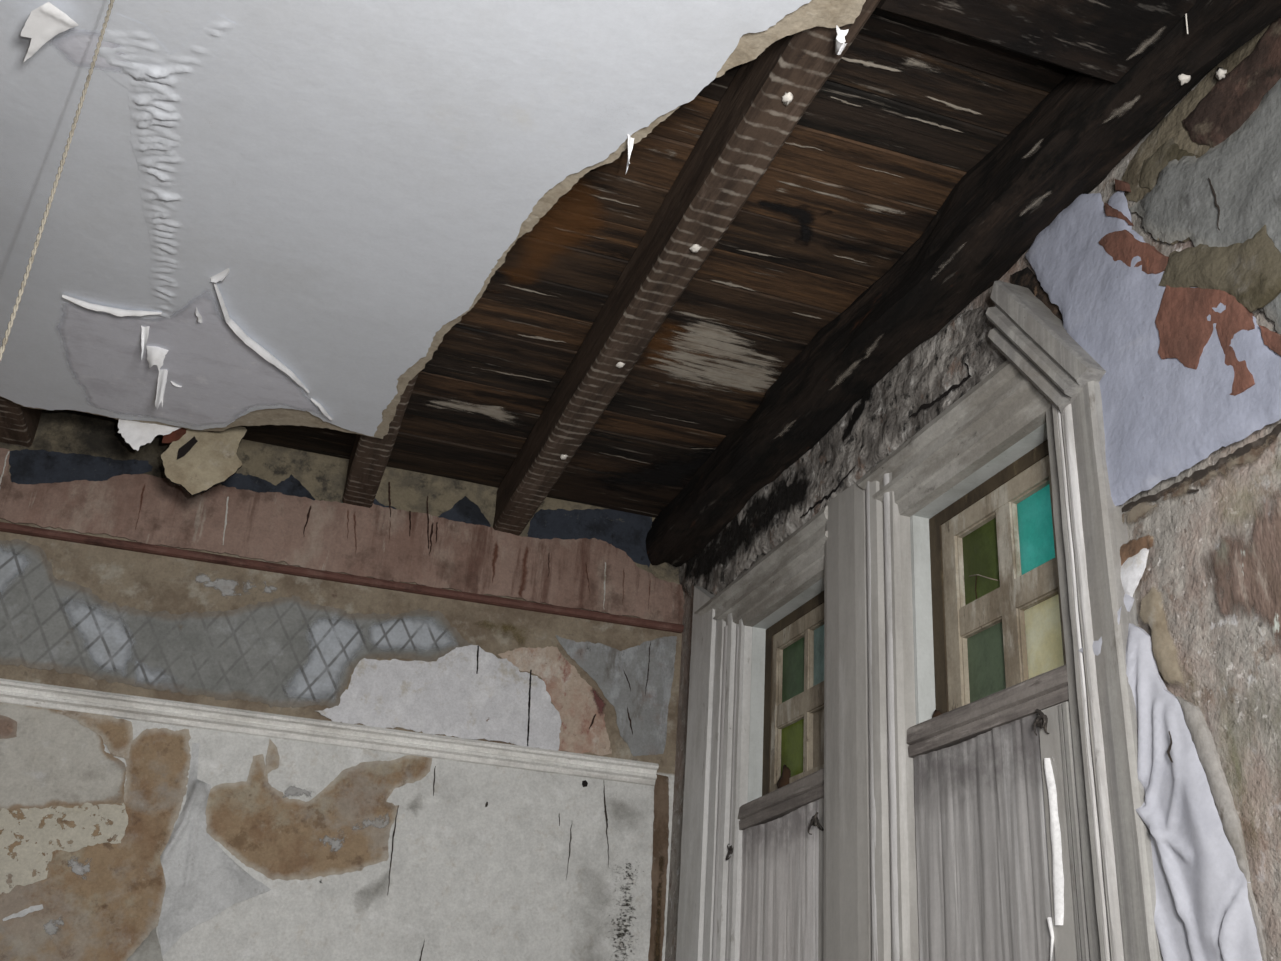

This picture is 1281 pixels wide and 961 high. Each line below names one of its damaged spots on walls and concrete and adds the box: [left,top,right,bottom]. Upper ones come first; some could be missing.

peeling [21,2,128,70]
spalling [715,0,866,78]
peeling [59,106,680,439]
peeling [1010,17,1281,523]
peeling [438,496,491,527]
peeling [527,508,652,567]
spalling [679,306,1007,599]
peeling [316,645,612,756]
peeling [0,710,191,961]
peeling [205,738,432,883]
leakage [609,774,669,961]